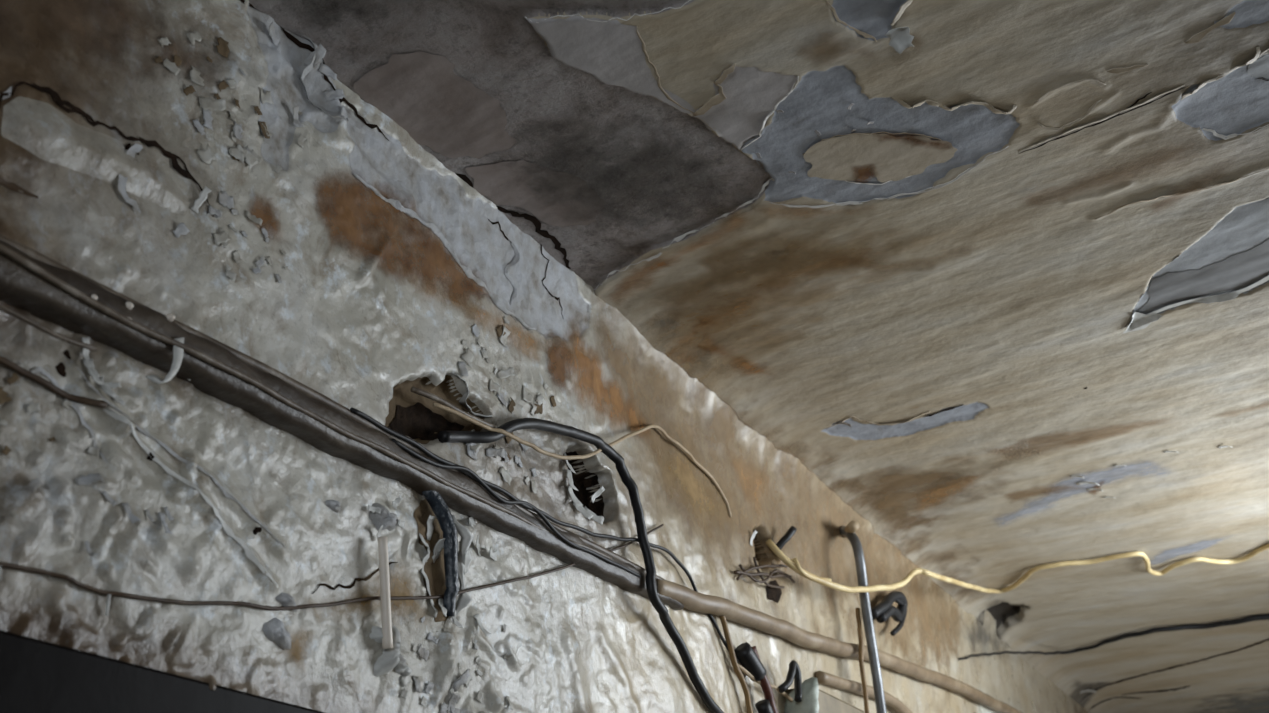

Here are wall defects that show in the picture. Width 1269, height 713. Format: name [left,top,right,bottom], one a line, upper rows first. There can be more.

crack [0,81,209,213]
corrosion [251,199,279,235]
corrosion [317,178,645,434]
spalling [154,0,1020,347]
spalling [1120,198,1269,334]
peeling [1172,46,1269,141]
spalling [385,323,556,493]
spalling [563,451,605,525]
water stain [600,323,971,664]
water stain [995,426,1135,454]
peeling [398,499,507,713]
crack [1079,639,1269,712]